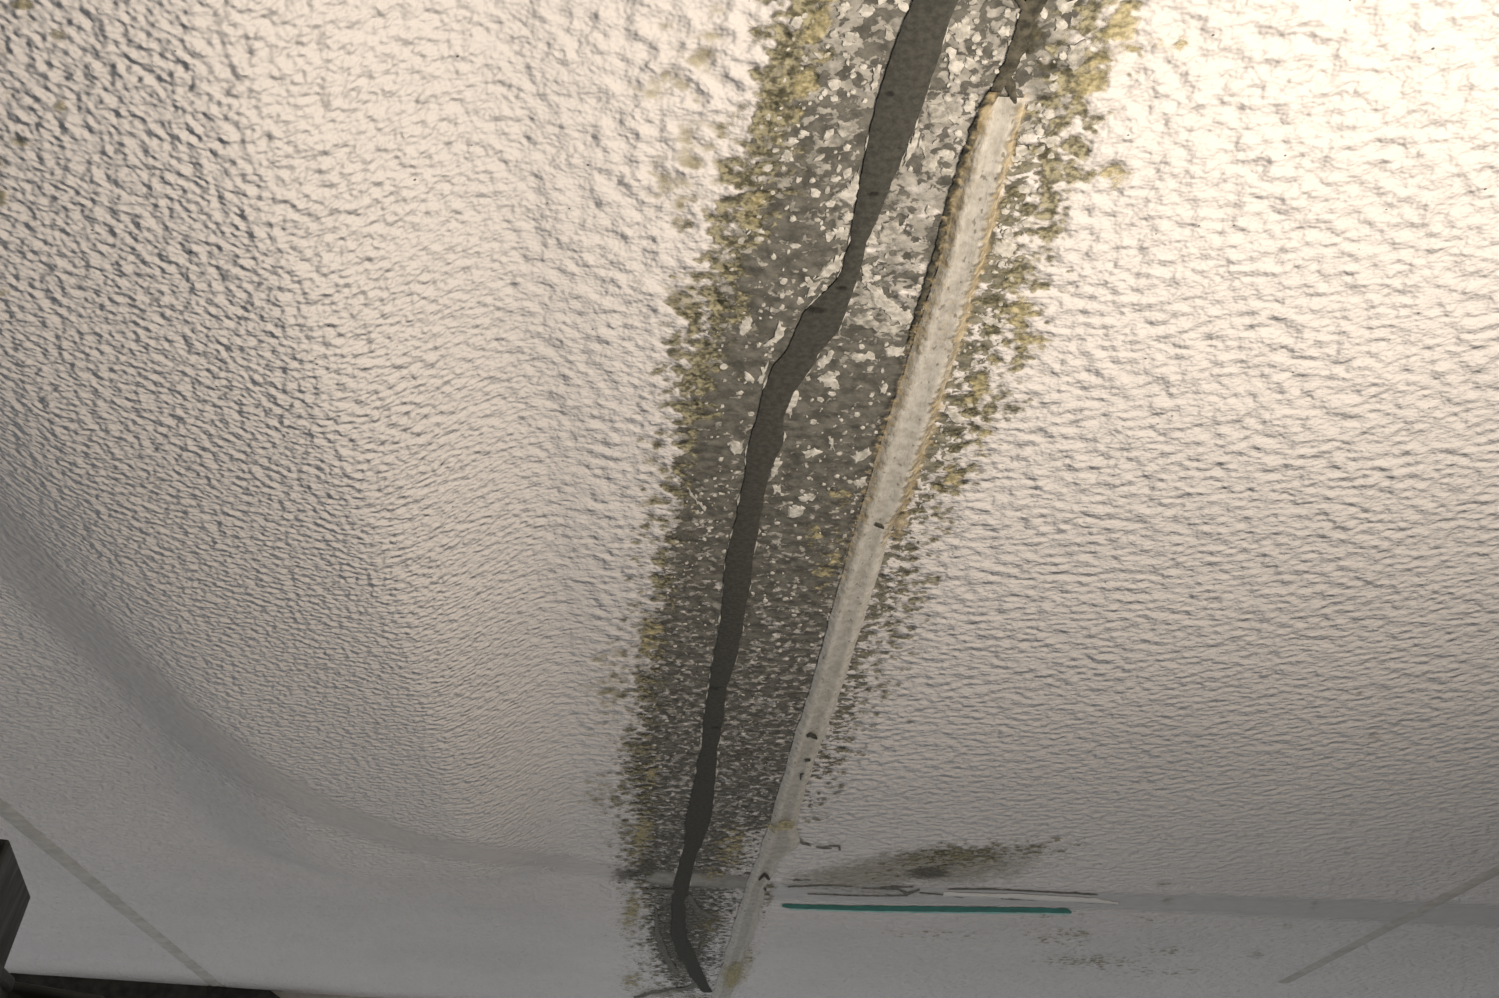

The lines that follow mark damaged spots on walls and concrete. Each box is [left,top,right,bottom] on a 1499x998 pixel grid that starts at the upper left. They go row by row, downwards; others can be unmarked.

water stain [12,0,32,10]
water stain [587,0,835,996]
crack [634,0,958,998]
water stain [797,837,1079,894]
water stain [766,0,1143,833]
crack [907,0,1061,346]